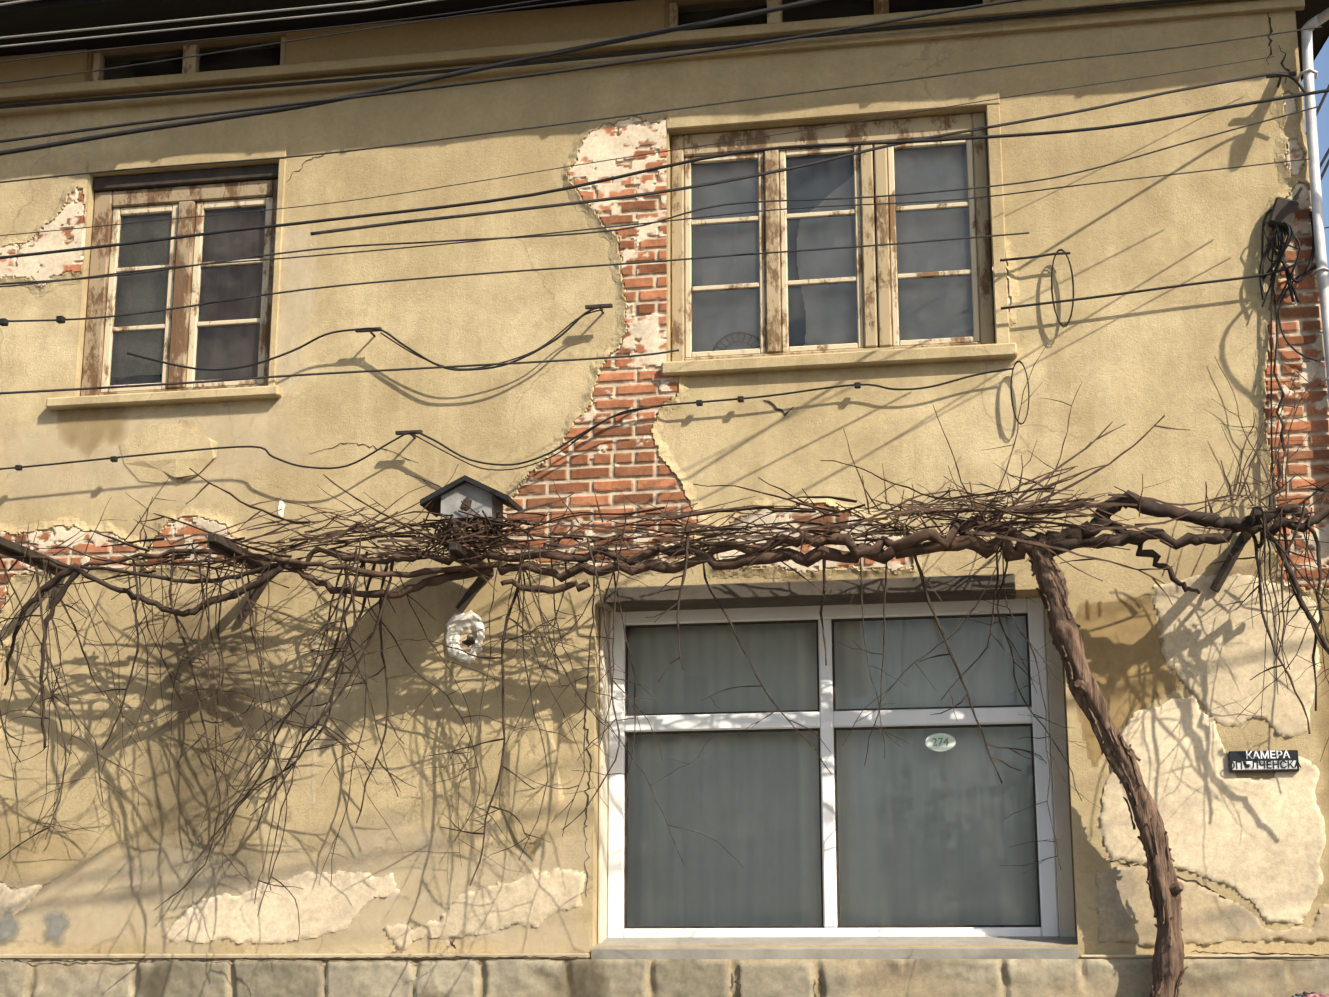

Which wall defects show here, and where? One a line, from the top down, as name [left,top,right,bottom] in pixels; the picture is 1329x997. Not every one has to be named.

flaking render [0,177,88,298]
flaking render [493,109,924,582]
flaking render [1121,82,1329,946]
flaking render [0,505,251,752]
flaking render [0,883,42,919]
flaking render [162,870,403,945]
crack [733,965,741,997]
flaking render [1096,768,1157,947]